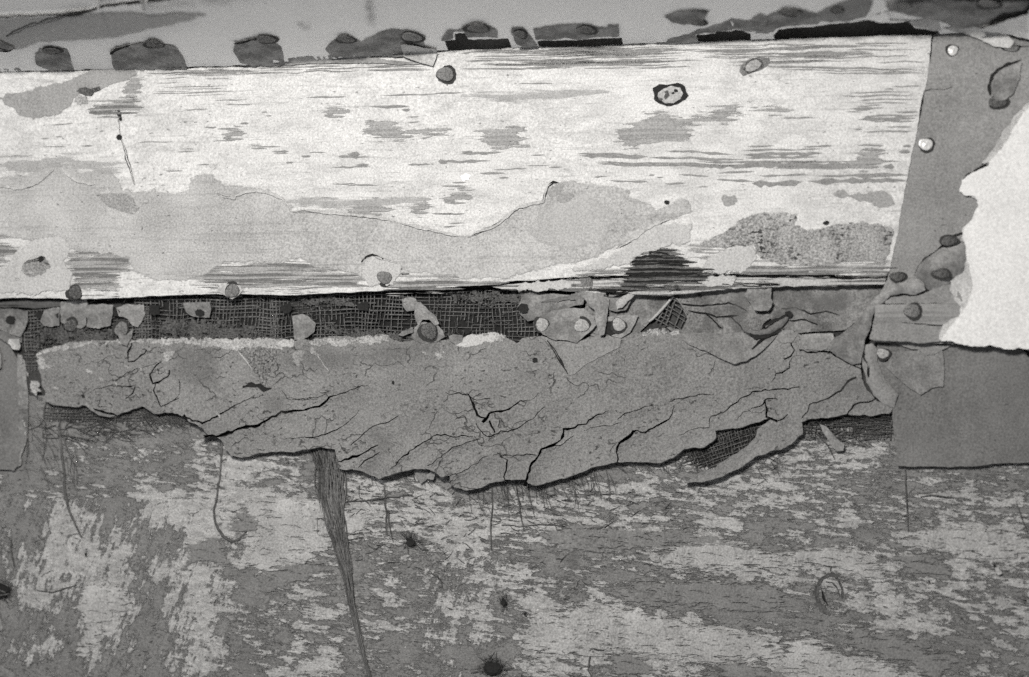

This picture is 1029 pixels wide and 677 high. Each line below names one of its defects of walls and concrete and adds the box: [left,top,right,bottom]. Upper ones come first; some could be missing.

peeling [0,12,205,50]
peeling [0,69,143,119]
peeling [363,120,452,142]
peeling [474,125,530,150]
peeling [613,101,796,149]
peeling [0,163,898,300]
crack [482,275,625,303]
crack [714,272,887,280]
crack [37,302,892,496]
peeling [181,498,375,575]
peeling [895,524,1029,563]
peeling [524,520,963,677]